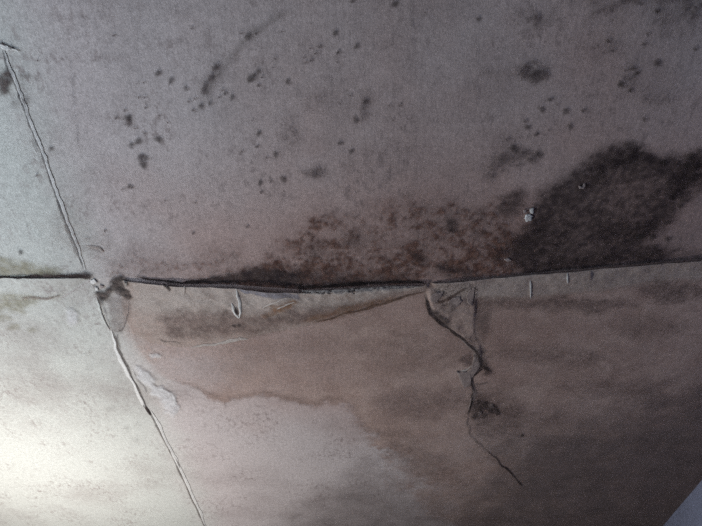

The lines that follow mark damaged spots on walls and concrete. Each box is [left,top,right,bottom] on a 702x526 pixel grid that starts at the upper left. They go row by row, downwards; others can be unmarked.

damp [187,64,233,111]
crack [0,49,206,526]
damp [136,367,178,413]
crack [137,258,698,417]
damp [189,138,702,526]
crack [478,443,522,486]